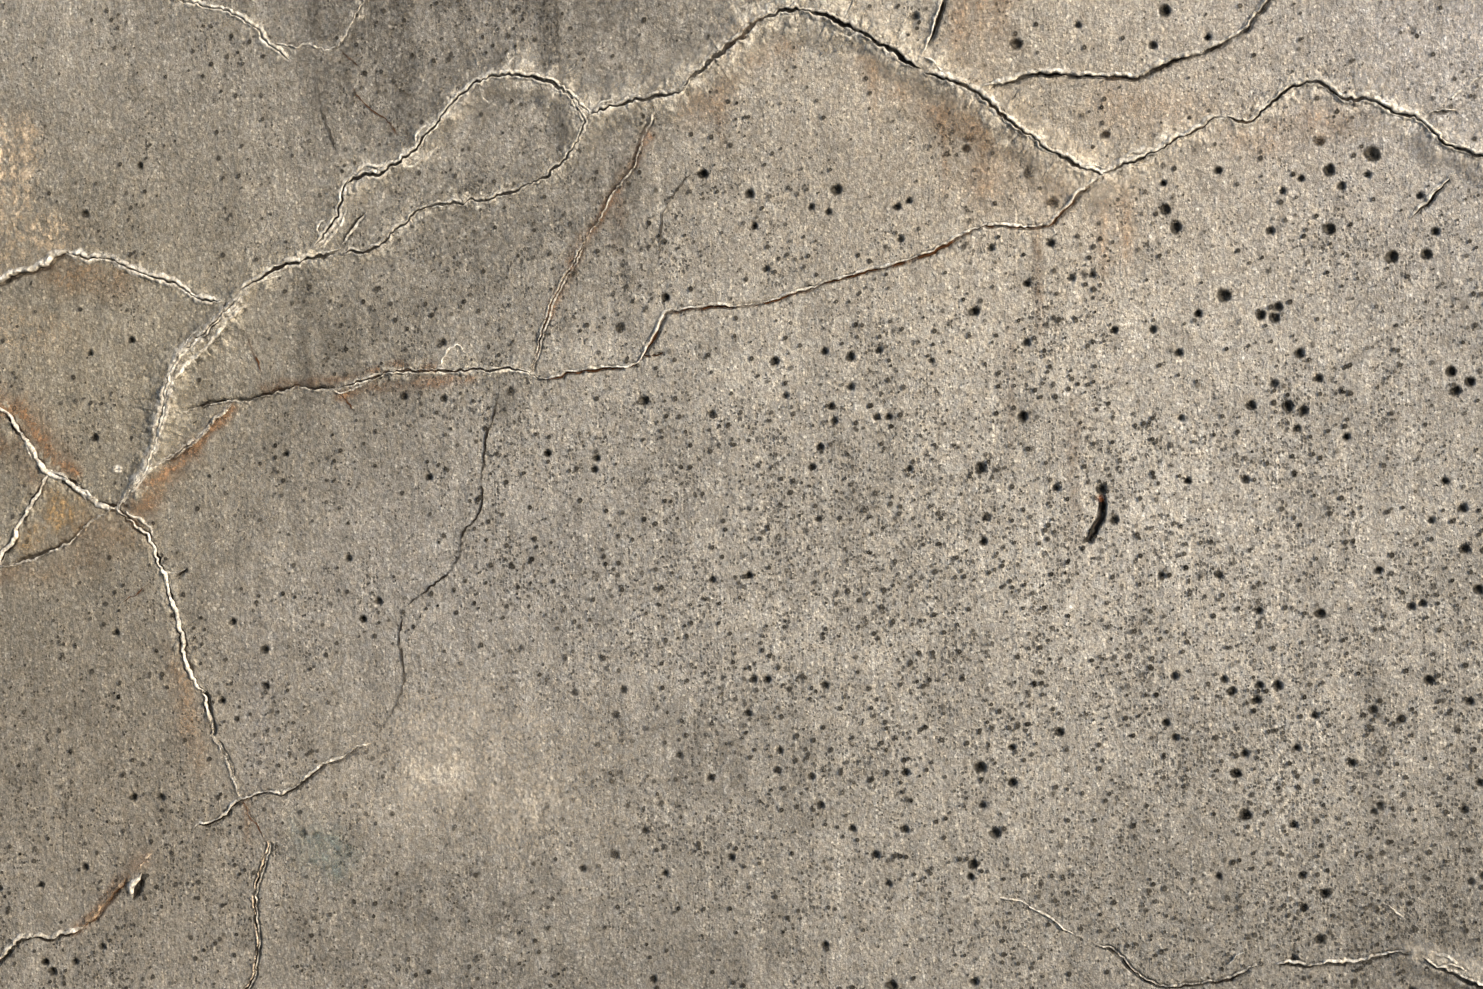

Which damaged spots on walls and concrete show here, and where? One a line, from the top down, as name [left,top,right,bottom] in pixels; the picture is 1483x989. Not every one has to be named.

crack [763,0,1483,304]
crack [0,0,944,797]
crack [194,798,242,828]
crack [243,756,345,837]
crack [0,853,151,963]
crack [244,841,271,989]
crack [999,897,1483,989]